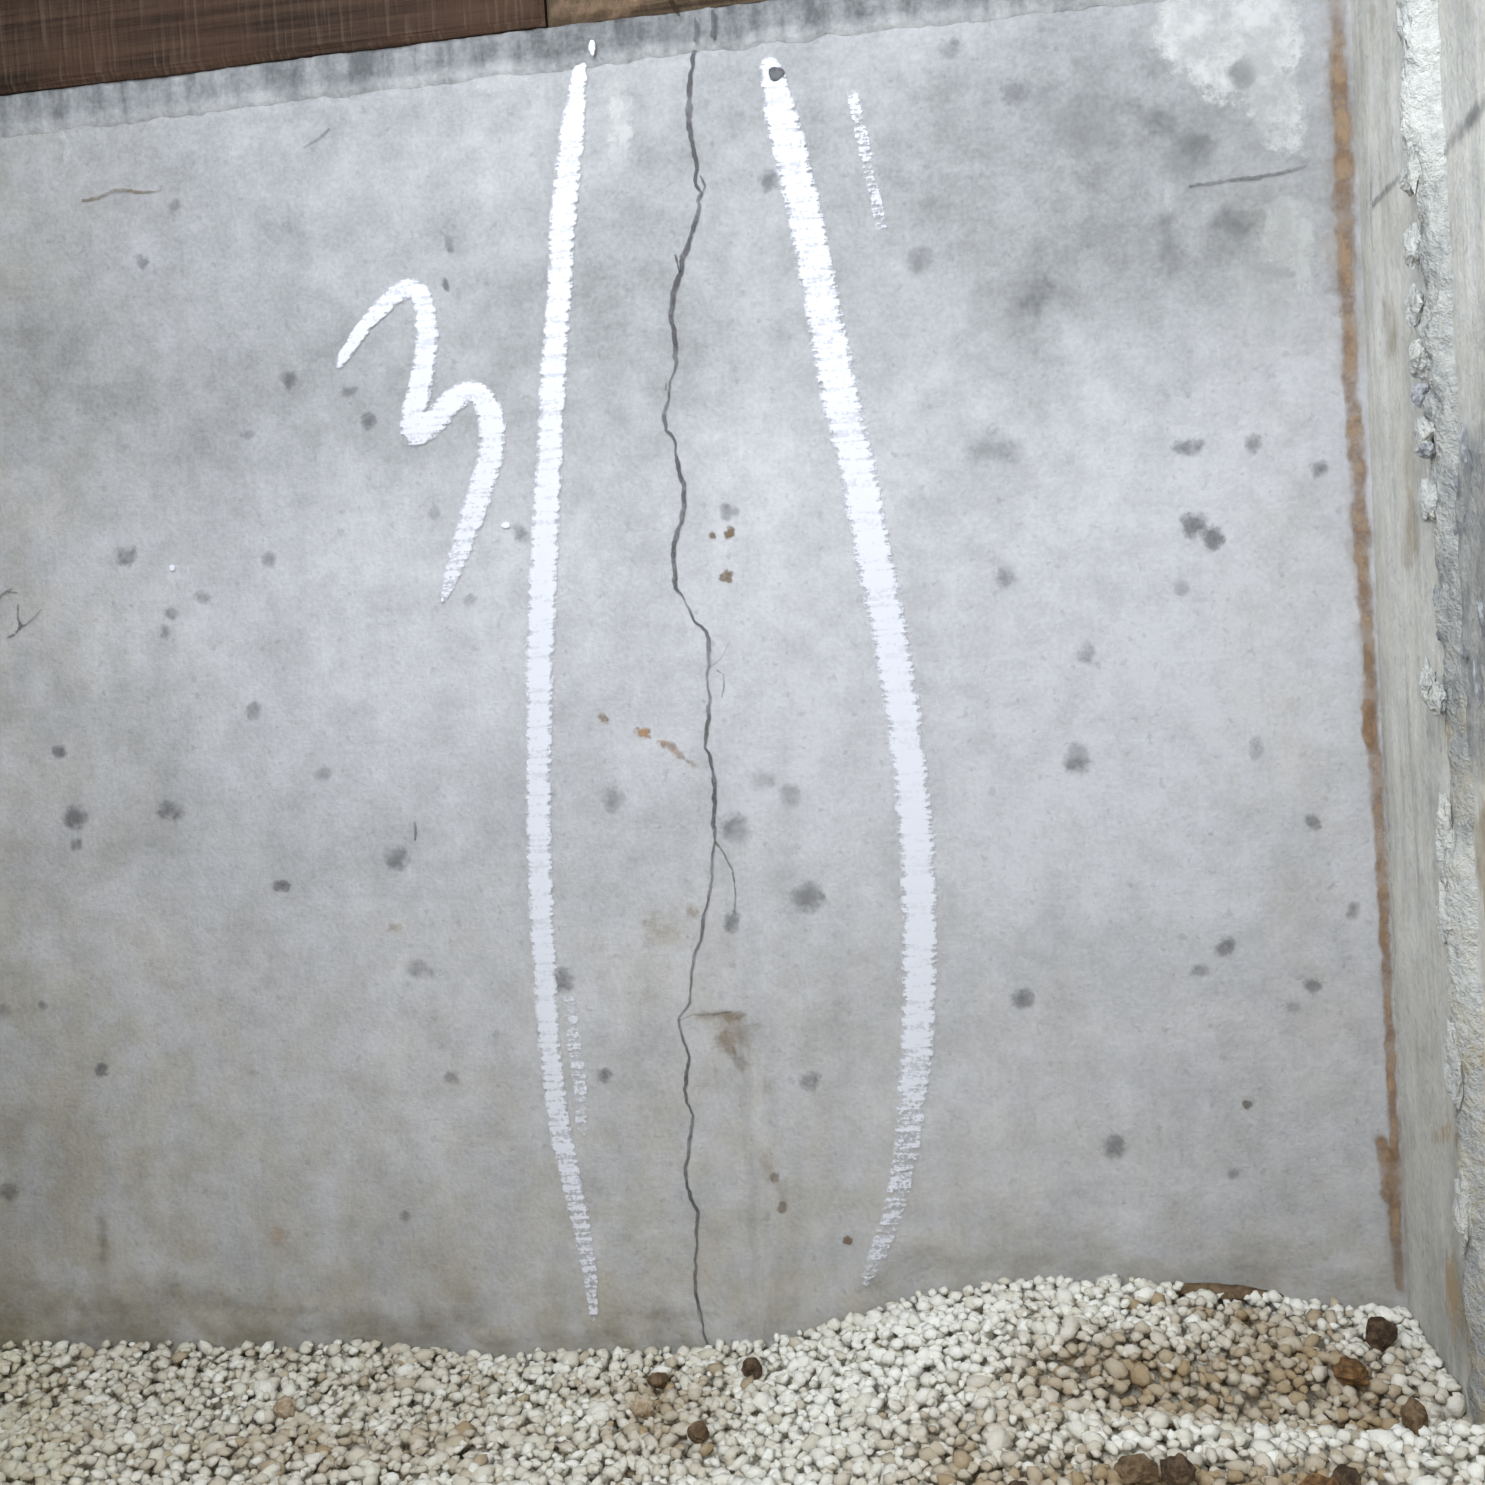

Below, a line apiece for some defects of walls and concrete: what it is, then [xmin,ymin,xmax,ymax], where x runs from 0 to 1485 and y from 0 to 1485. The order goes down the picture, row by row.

crack [662,0,716,650]
rust [1331,33,1401,1284]
spalling [1459,645,1483,709]
crack [677,692,735,1345]